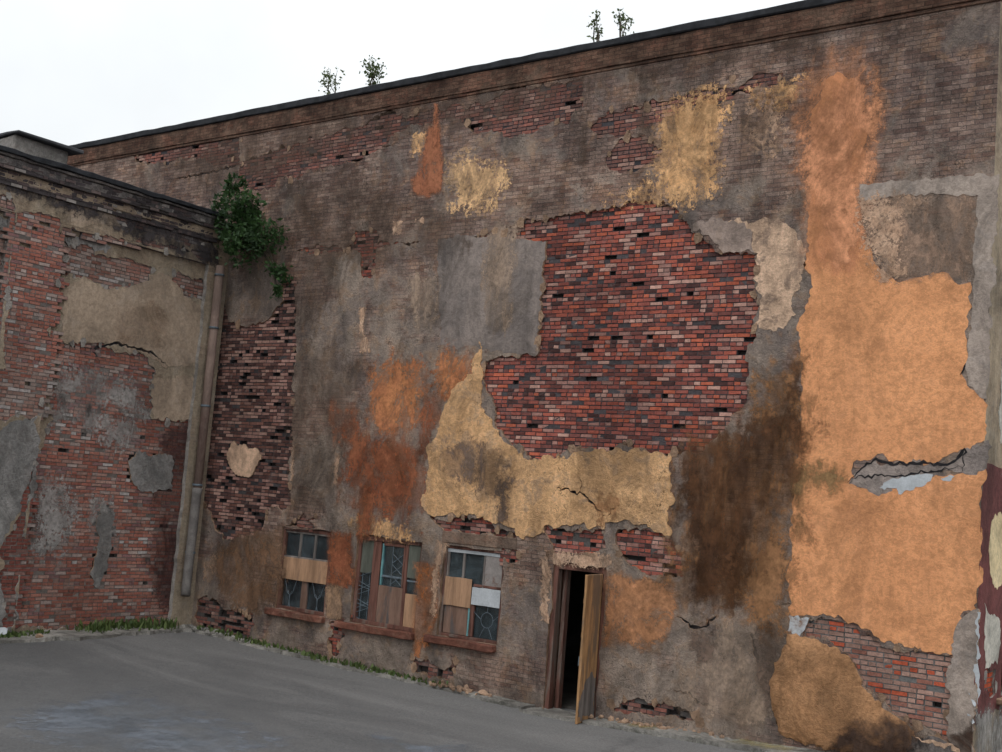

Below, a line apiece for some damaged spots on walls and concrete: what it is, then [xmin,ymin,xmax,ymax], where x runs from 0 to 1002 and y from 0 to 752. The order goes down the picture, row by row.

flaking render [0,186,210,630]
flaking render [203,276,317,539]
crack [559,487,615,516]
flaking render [477,200,760,459]
leakage [601,573,676,649]
leakage [665,347,848,730]
peeling [786,185,1002,740]